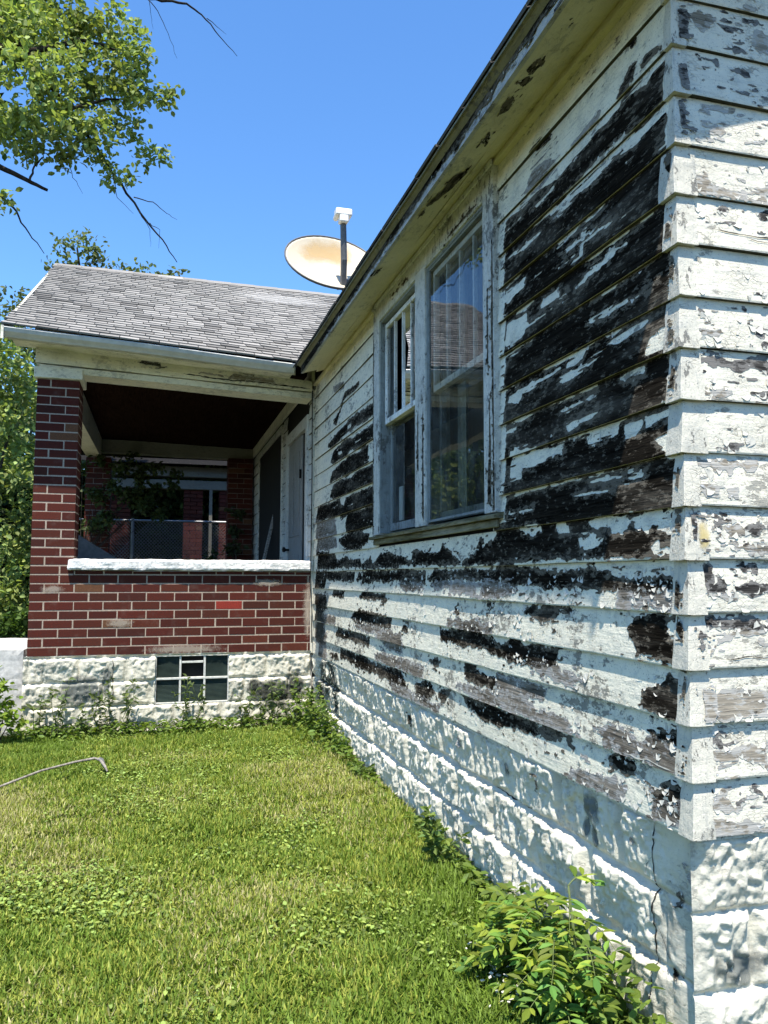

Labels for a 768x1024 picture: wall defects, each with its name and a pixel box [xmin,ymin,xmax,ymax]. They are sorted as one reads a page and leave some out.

peeling [301,0,562,372]
peeling [678,0,768,143]
peeling [314,43,768,837]
crack [645,829,667,1019]